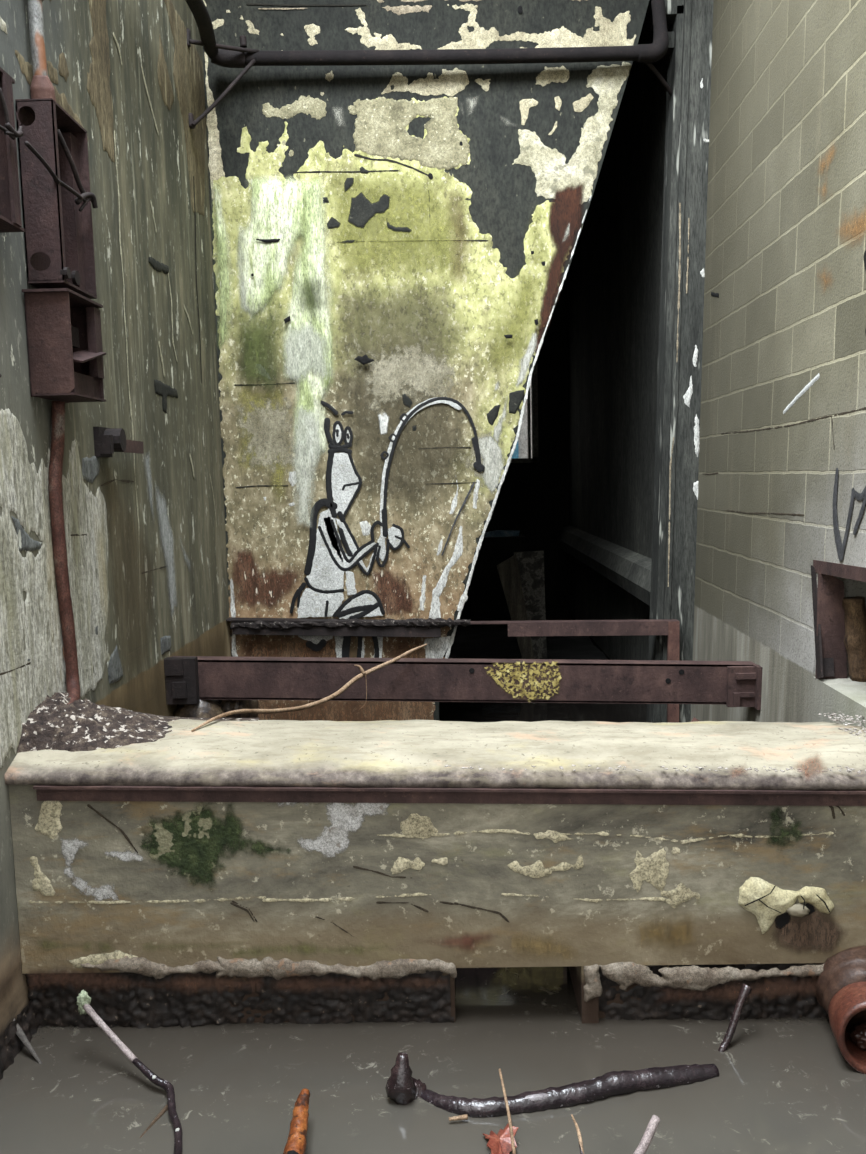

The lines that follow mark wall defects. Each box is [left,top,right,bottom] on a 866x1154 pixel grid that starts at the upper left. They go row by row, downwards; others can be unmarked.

peeling [154,0,636,658]
corrosion [535,185,583,353]
peeling [676,203,705,362]
water stain [237,397,320,523]
water stain [351,299,506,509]
peeling [0,408,123,768]
corrosion [233,551,298,608]
corrosion [231,570,470,658]
water stain [424,636,451,658]
water stain [419,526,463,619]
corrosion [257,701,430,721]
spalling [35,801,62,839]